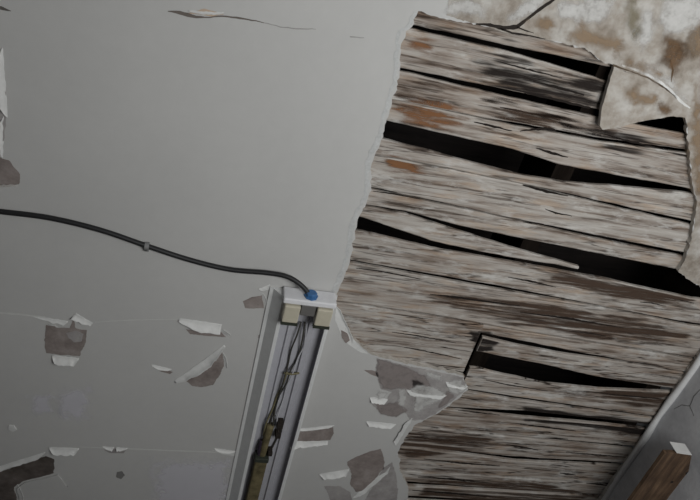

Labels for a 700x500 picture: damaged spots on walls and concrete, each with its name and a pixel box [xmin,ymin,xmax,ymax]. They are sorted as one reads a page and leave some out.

crack [476,0,555,39]
peeling [0,48,20,187]
peeling [331,11,417,293]
spalling [447,0,700,286]
peeling [243,284,270,309]
peeling [32,313,93,367]
peeling [151,318,231,387]
peeling [335,306,368,354]
peeling [365,358,468,446]
peeling [0,447,79,500]
peeling [319,449,398,500]